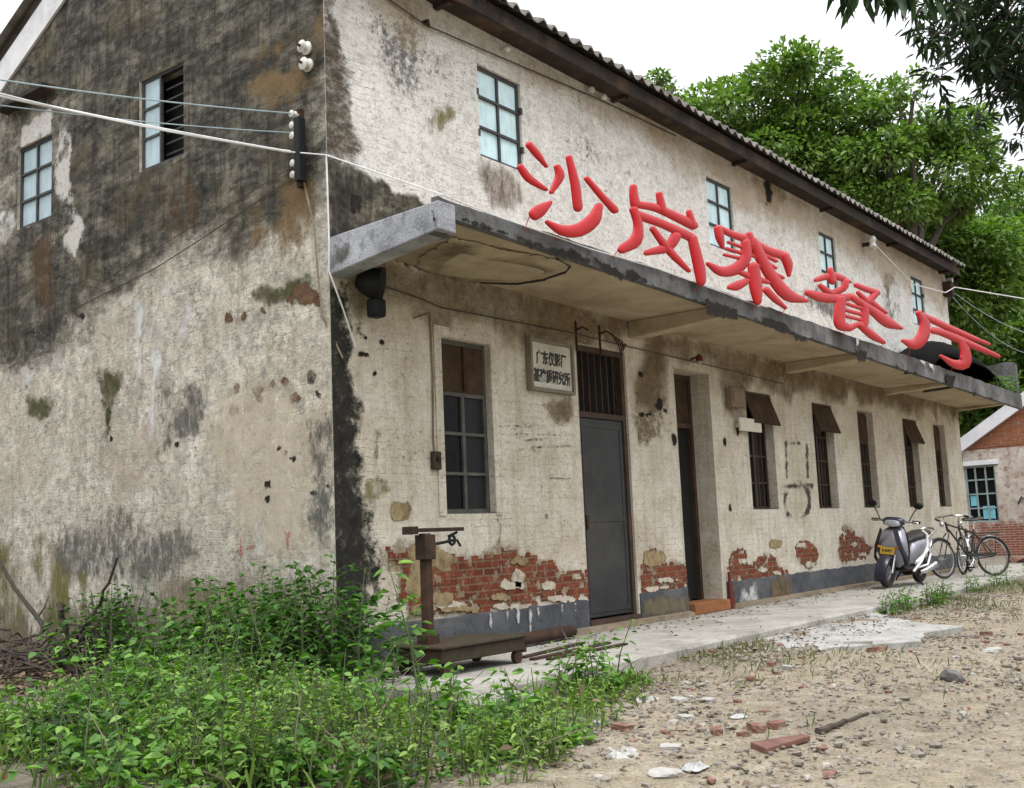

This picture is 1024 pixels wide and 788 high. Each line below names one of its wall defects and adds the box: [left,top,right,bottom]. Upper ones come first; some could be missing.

damp [0,0,424,453]
flaking render [286,281,320,307]
damp [373,263,628,345]
damp [817,226,943,319]
damp [636,335,958,419]
damp [307,282,383,631]
damp [0,506,318,672]
flaking render [385,542,589,619]
flaking render [640,547,687,593]
flaking render [727,539,788,582]
flaking render [795,540,819,570]
flaking render [838,525,873,563]